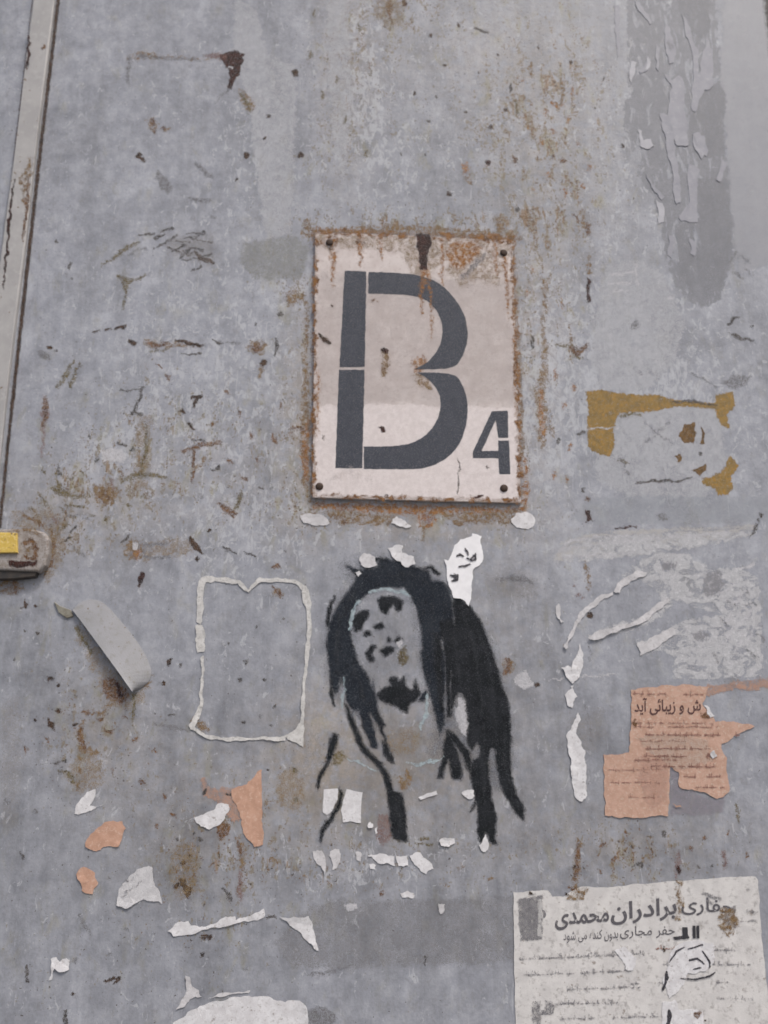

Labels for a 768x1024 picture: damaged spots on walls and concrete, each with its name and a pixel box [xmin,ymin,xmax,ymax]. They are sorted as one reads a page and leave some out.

rust [202,50,255,112]
rust [300,216,523,241]
rust [503,60,574,146]
peeling [614,0,735,307]
rust [278,269,589,541]
rust [53,622,154,795]